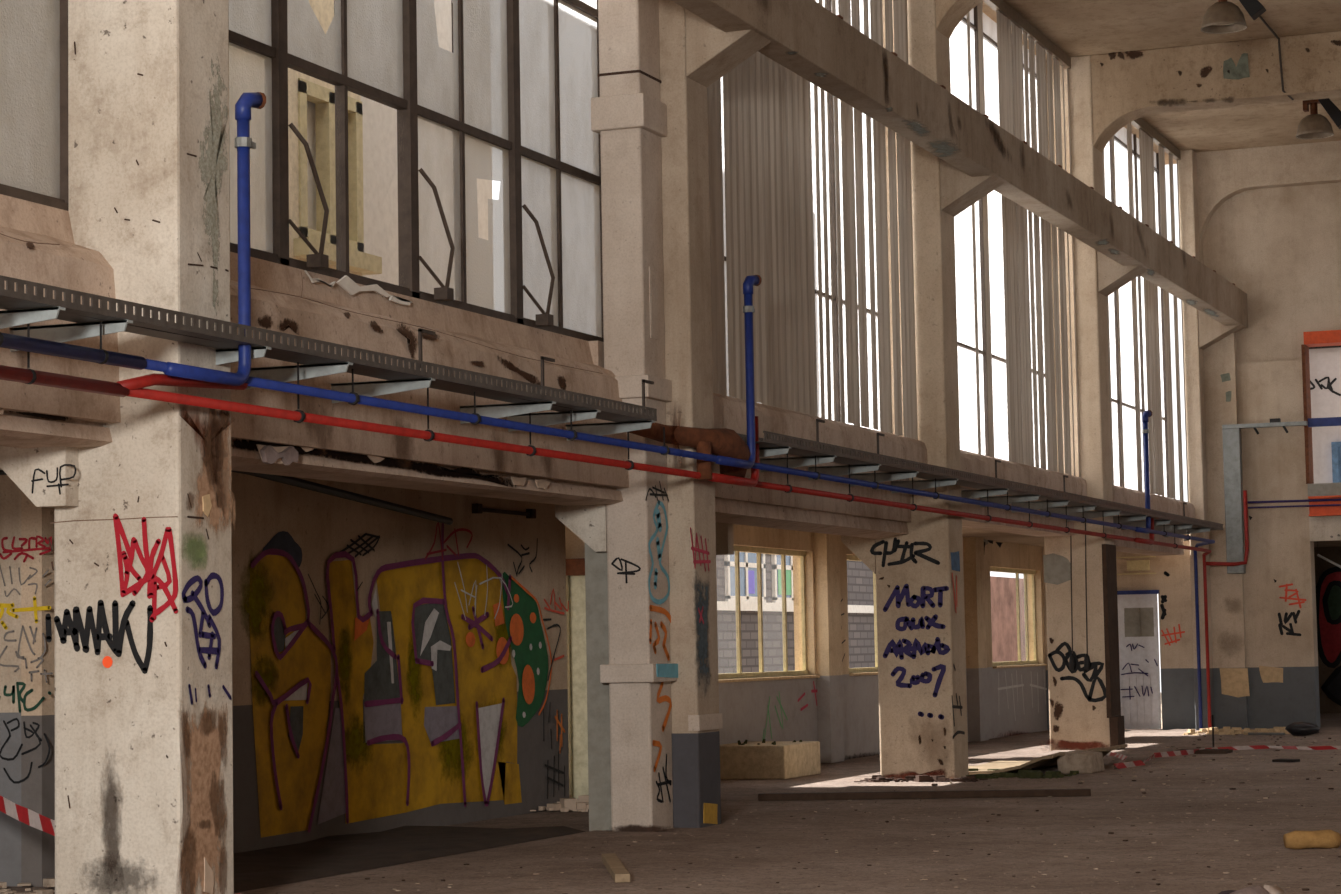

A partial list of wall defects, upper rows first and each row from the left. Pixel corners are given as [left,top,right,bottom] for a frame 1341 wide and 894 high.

peeling [1100,51,1143,66]
peeling [1197,53,1250,87]
peeling [304,270,413,306]
flaking render [258,315,299,335]
flaking render [370,321,440,358]
flaking render [471,356,541,385]
flaking render [187,409,551,540]
flaking render [180,706,227,894]
water stain [93,779,145,891]